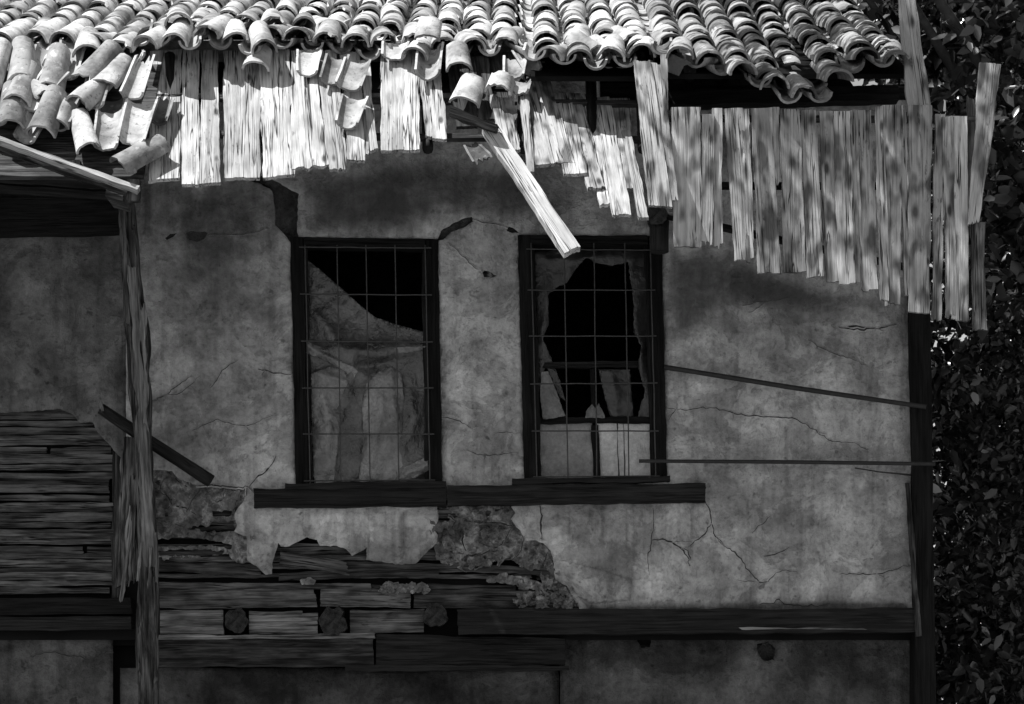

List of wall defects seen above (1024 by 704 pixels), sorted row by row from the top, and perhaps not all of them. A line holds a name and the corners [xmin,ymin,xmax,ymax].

crack [808,322,897,366]
crack [152,359,292,403]
crack [192,414,274,433]
crack [667,405,868,451]
crack [196,455,277,496]
flaking render [153,470,255,564]
flaking render [429,500,578,609]
crack [646,487,823,608]
flaking render [378,581,431,595]